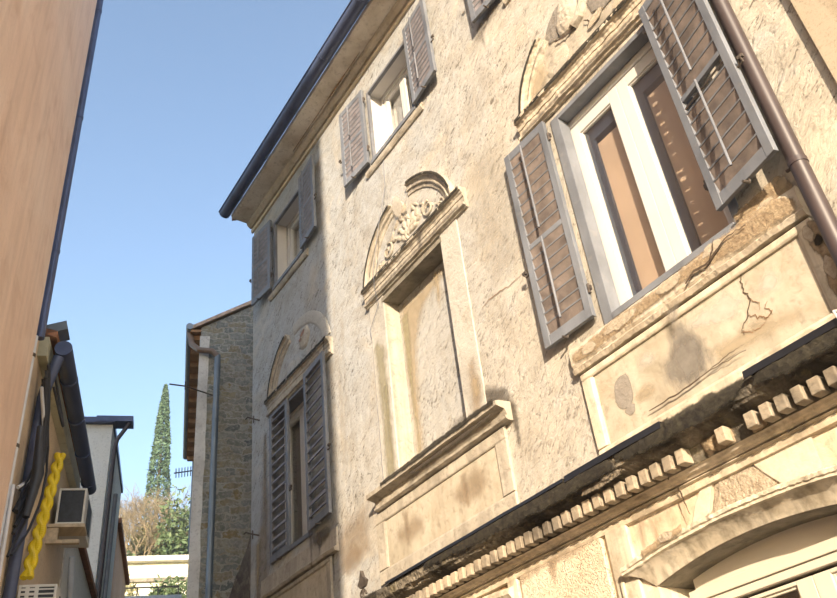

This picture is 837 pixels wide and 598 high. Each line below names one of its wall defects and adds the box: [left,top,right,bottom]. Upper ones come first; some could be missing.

damp [668,310,704,382]
crack [649,275,773,411]